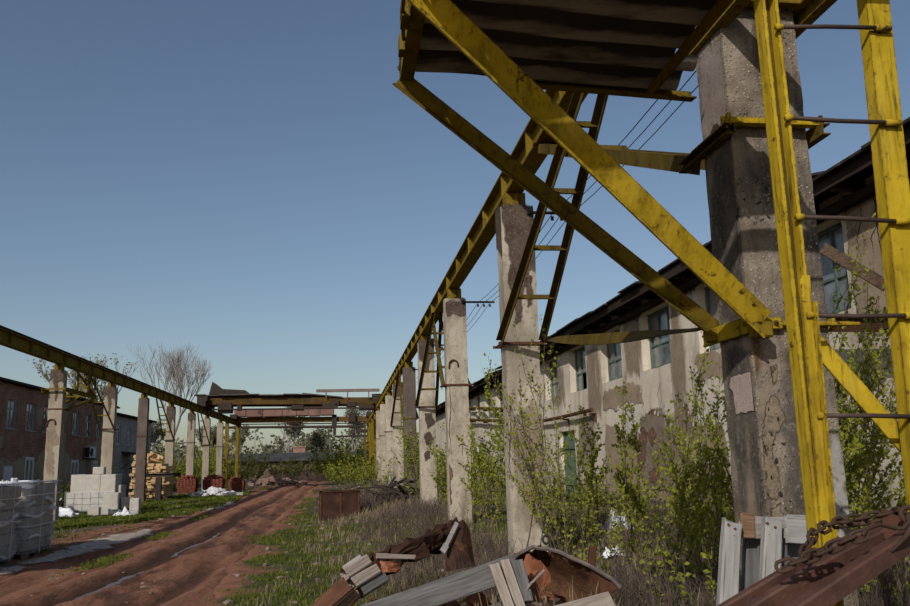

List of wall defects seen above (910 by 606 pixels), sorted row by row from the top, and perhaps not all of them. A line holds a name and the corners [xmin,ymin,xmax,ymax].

water stain [495,204,536,324]
water stain [46,421,59,505]
water stain [50,369,64,401]
spalling [602,319,733,509]